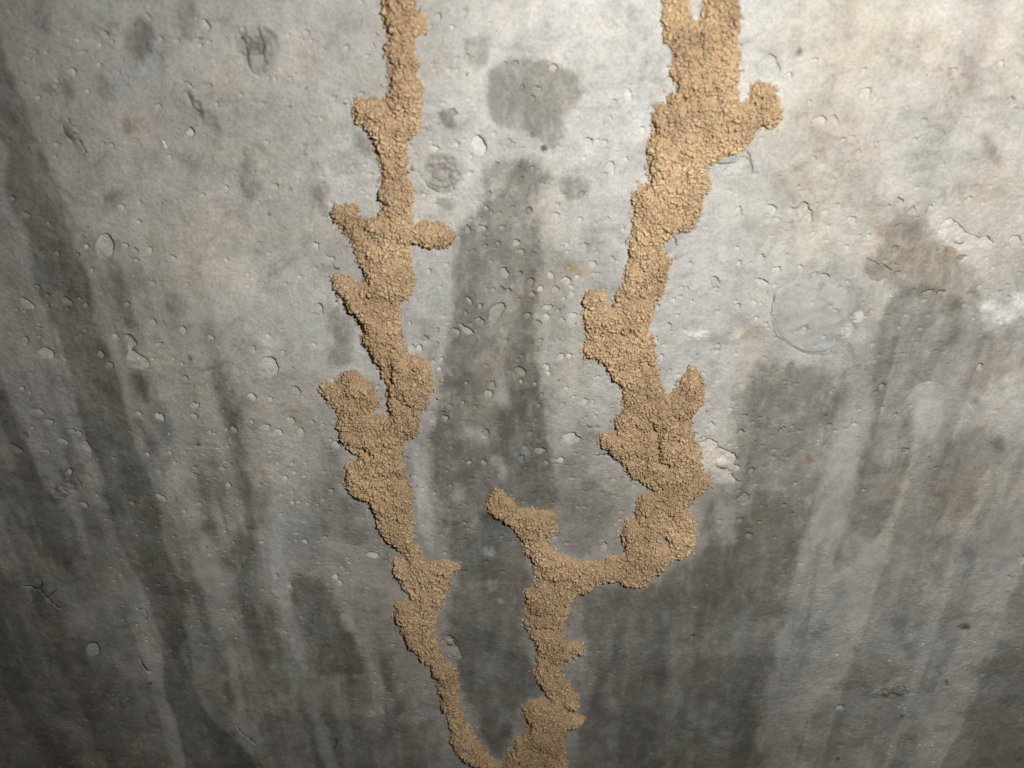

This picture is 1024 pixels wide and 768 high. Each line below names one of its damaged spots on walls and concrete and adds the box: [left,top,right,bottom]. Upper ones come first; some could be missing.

leakage [982,294,1024,322]
leakage [267,498,308,671]
leakage [794,422,858,591]